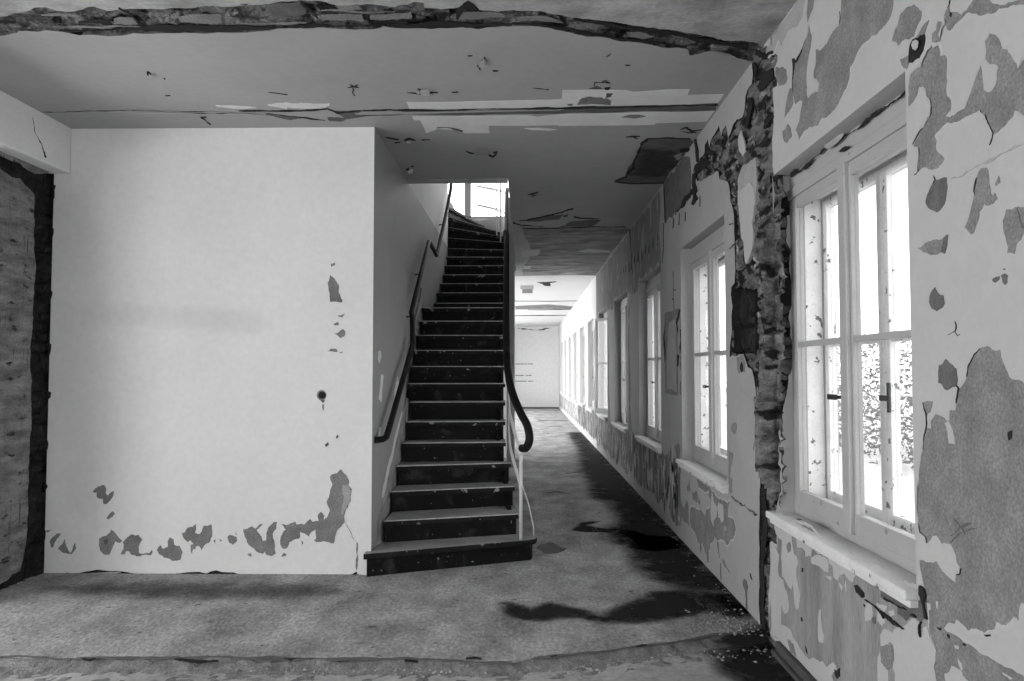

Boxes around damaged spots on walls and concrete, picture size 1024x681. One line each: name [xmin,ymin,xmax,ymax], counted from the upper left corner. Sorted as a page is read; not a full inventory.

spalling [0,0,762,61]
crack [32,108,387,158]
peeling [567,80,613,106]
peeling [614,137,693,222]
spalling [0,158,76,590]
peeling [327,262,345,353]
peeling [521,192,661,319]
peeling [694,0,1024,681]
peeling [578,326,736,565]
peeling [93,468,353,574]